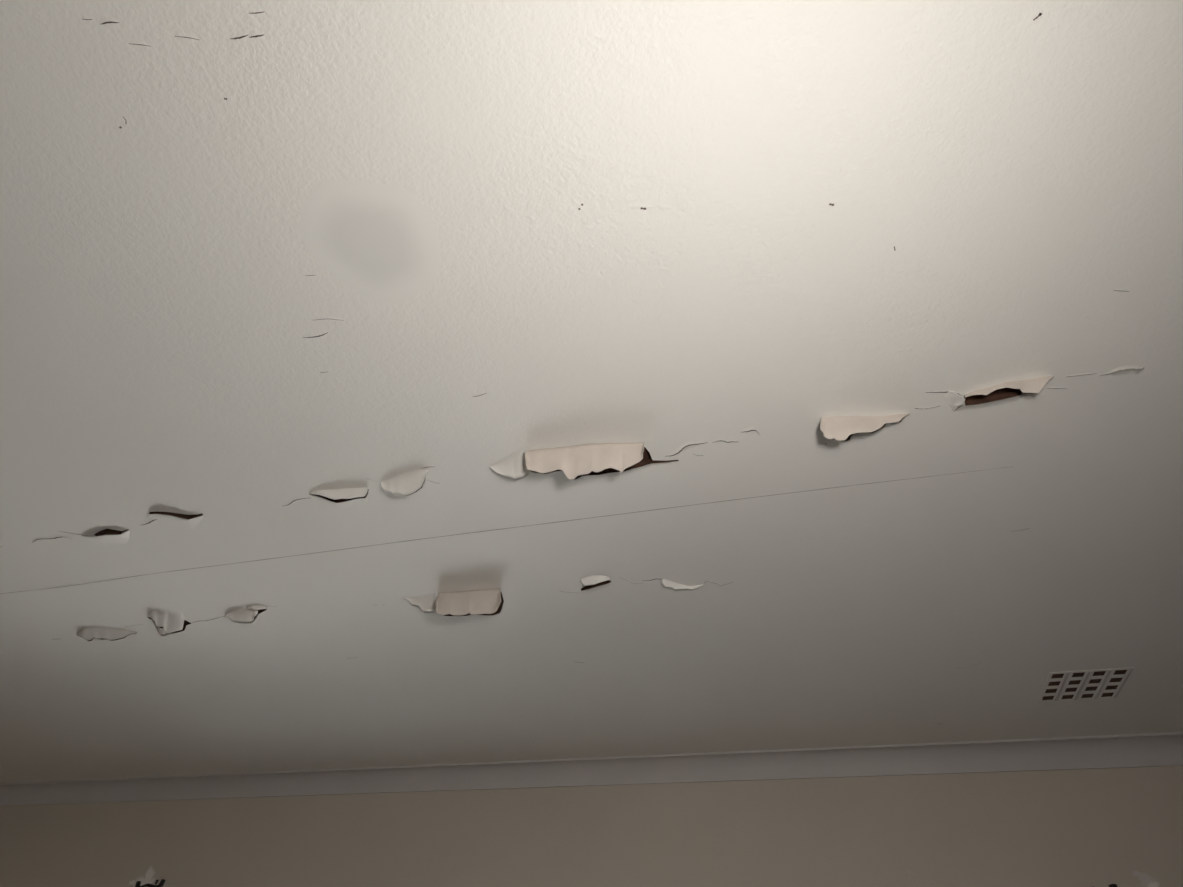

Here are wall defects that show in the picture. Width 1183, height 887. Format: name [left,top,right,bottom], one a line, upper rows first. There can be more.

peeling [820,372,1097,445]
crack [665,426,760,458]
peeling [490,443,679,483]
peeling [282,465,440,509]
peeling [81,512,204,546]
peeling [558,575,734,593]
peeling [402,589,504,618]
peeling [77,605,277,643]